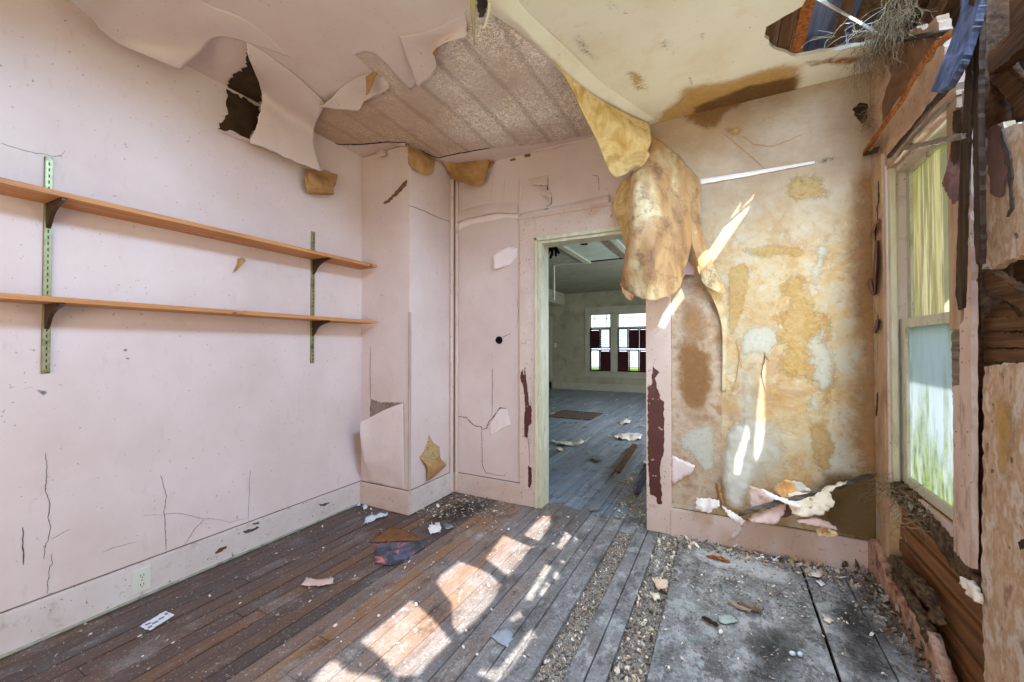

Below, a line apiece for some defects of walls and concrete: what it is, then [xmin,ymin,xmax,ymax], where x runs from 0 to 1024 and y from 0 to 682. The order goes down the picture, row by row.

damp [658,67,802,169]
flaking render [370,399,404,417]
flaking render [419,435,441,459]
crack [458,369,506,476]
peeling [520,368,532,438]
flaking render [647,273,723,506]
damp [680,304,711,409]
crack [44,452,66,591]
crack [143,471,251,544]